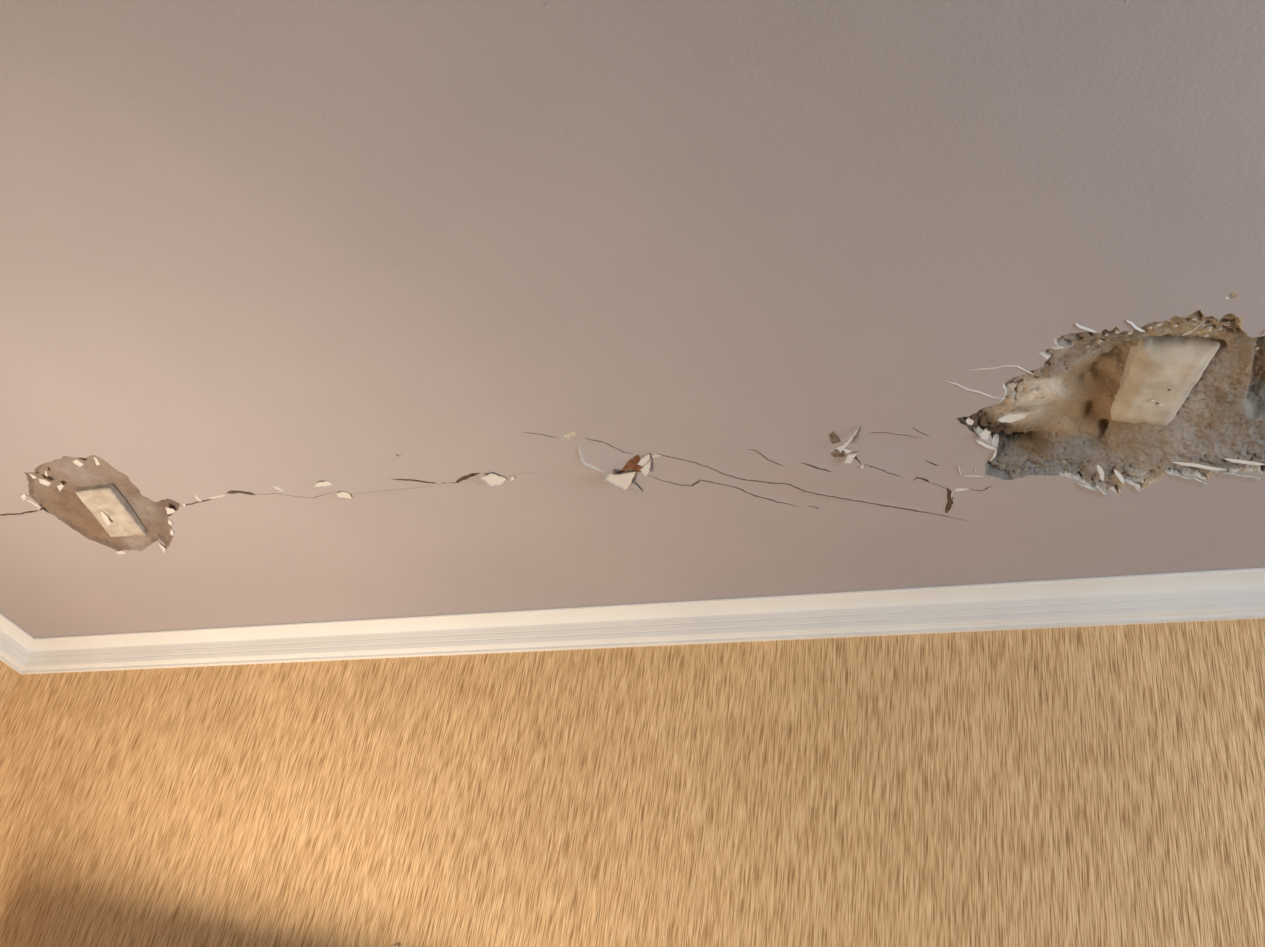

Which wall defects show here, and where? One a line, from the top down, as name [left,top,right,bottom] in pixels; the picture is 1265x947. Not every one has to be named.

spalling [943,292,1265,500]
peeling [829,428,864,469]
crack [0,509,48,519]
spalling [20,455,186,554]
crack [181,479,459,508]
peeling [605,454,660,492]
crack [512,427,993,521]